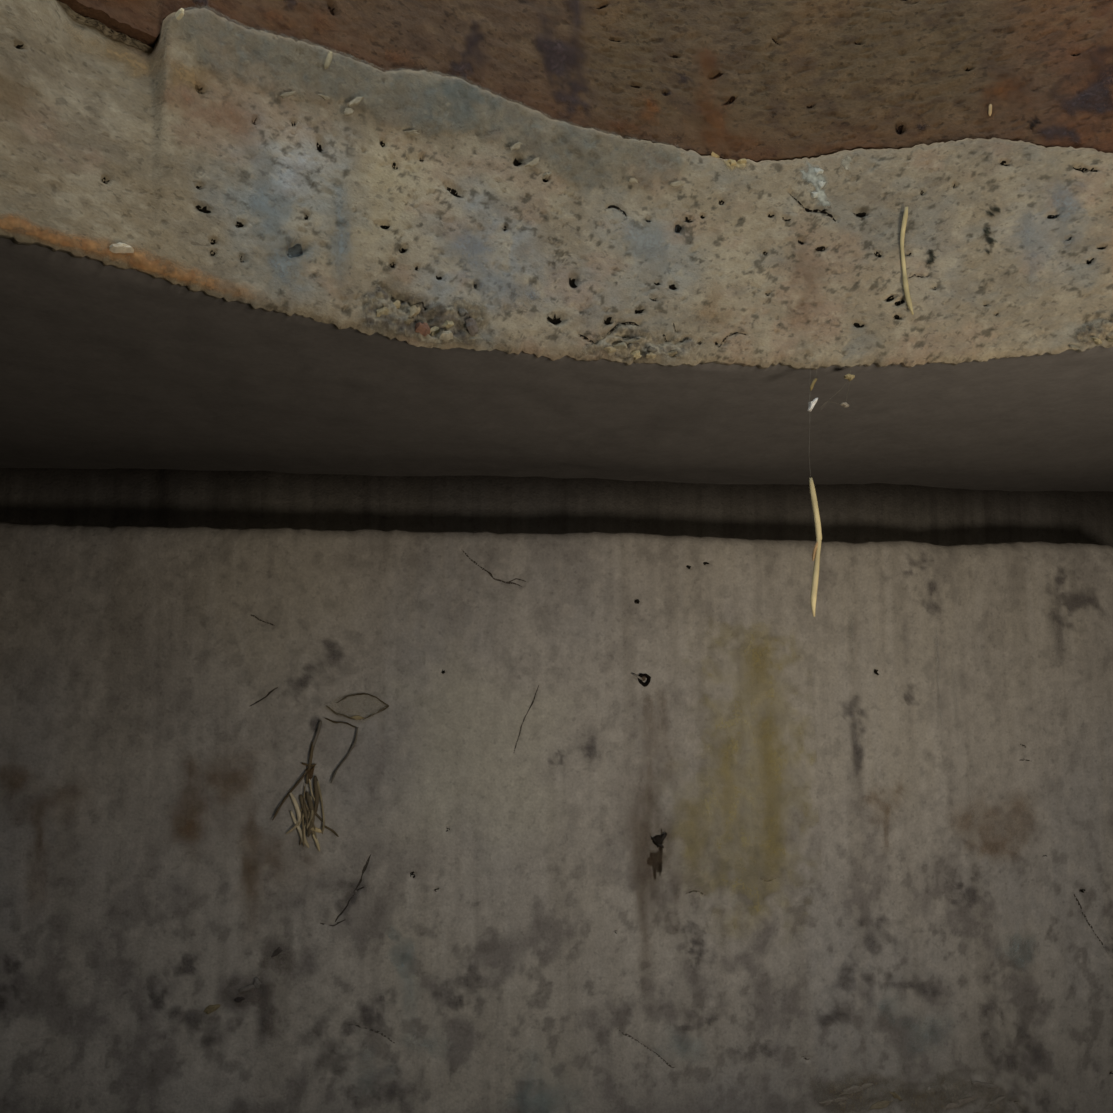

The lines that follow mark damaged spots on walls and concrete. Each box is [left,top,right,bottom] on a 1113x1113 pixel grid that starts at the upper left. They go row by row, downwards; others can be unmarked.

damp [1030,47,1113,142]
spalling [364,284,492,345]
spalling [584,283,718,360]